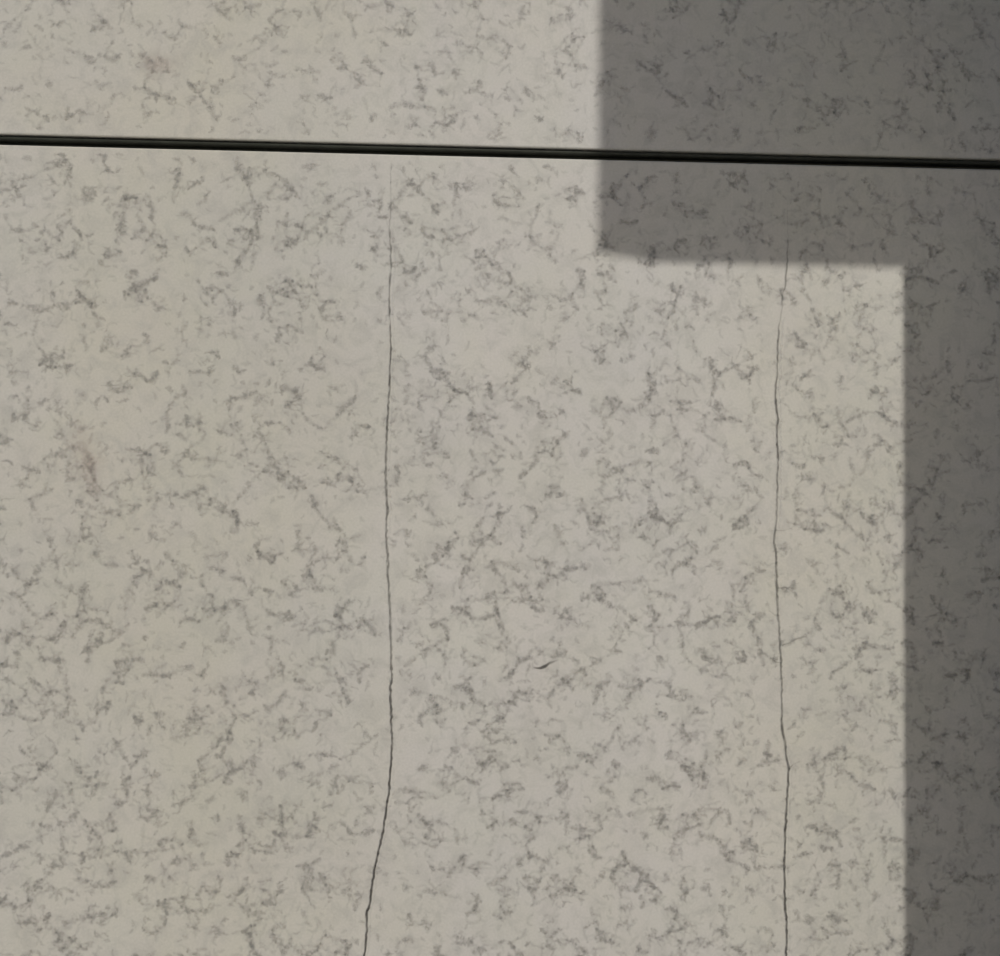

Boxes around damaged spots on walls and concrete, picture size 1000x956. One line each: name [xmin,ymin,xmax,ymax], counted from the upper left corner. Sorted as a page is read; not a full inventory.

crack [773,339,781,485]
crack [363,667,393,956]
crack [781,720,790,956]